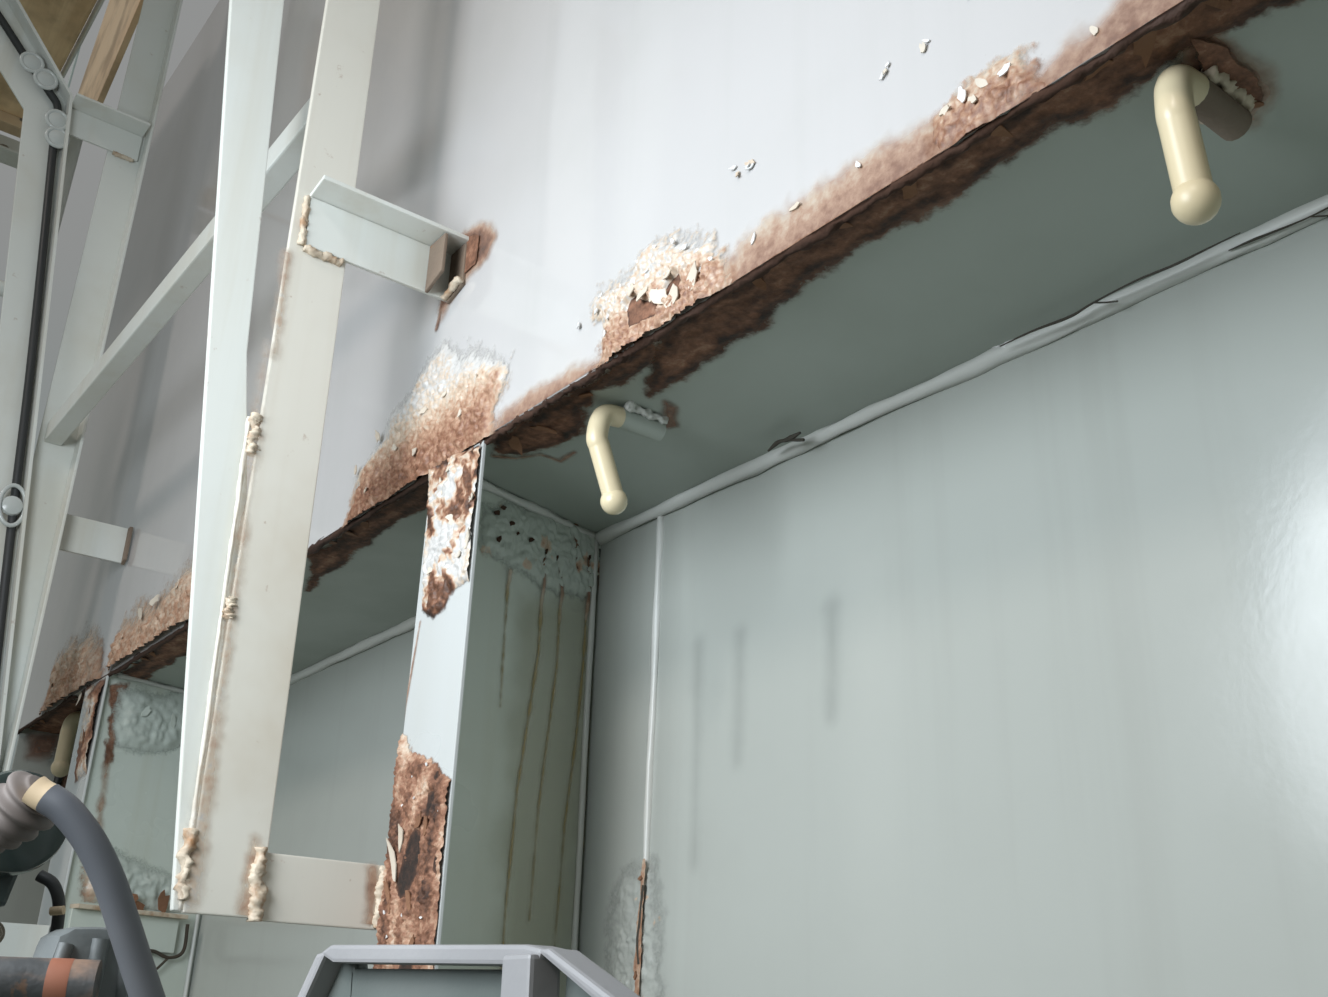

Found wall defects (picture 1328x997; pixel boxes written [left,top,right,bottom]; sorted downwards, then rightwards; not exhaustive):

rust [1019,0,1183,103]
rust [1181,36,1271,120]
rust [724,113,1003,287]
rust [464,223,496,278]
rust [435,300,448,331]
peeling [576,229,733,369]
rust [492,346,629,431]
rust [664,401,678,428]
rust [185,621,231,905]
rust [239,847,256,916]
rust [366,733,451,945]